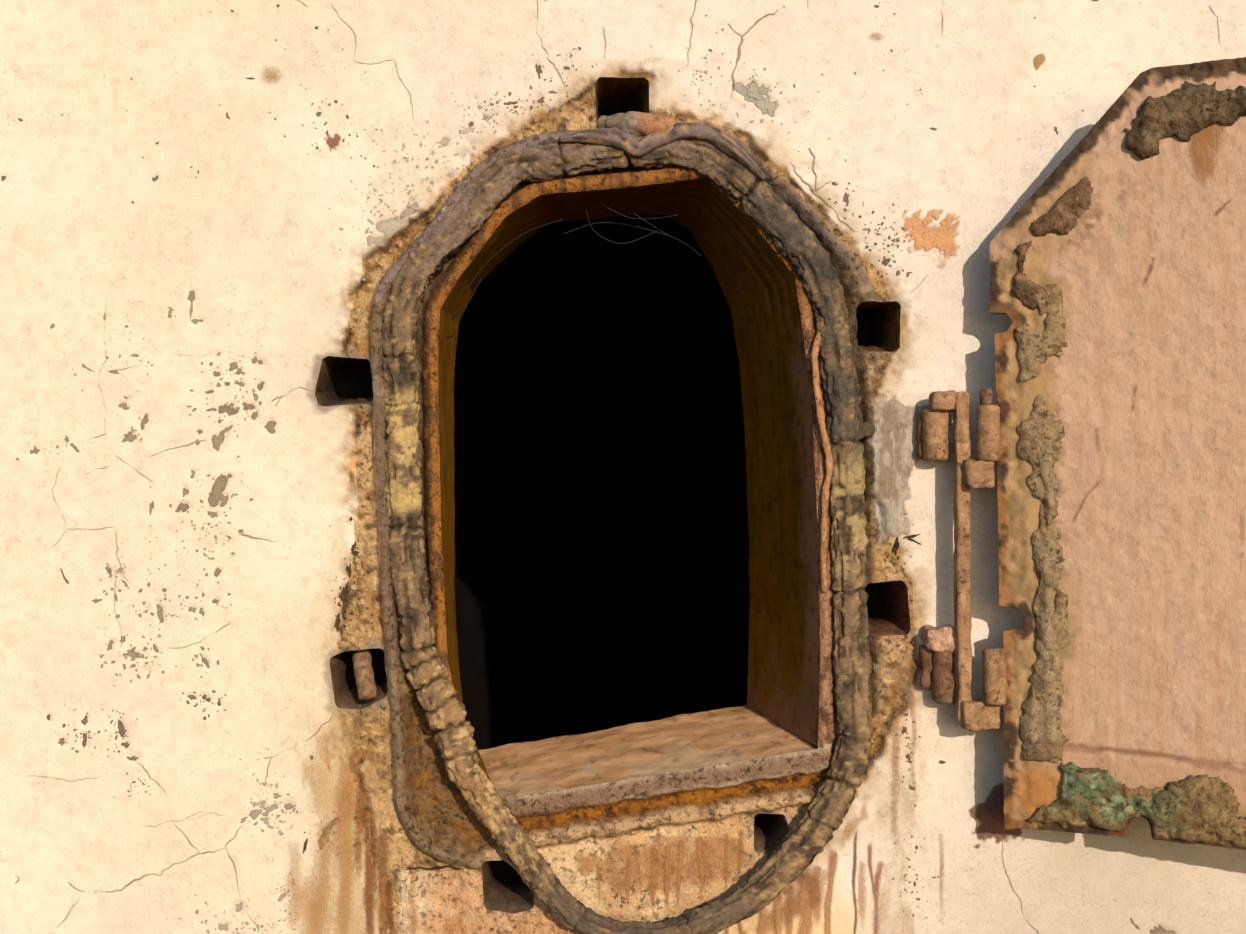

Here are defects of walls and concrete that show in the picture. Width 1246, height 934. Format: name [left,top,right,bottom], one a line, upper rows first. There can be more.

crack [298,0,414,123]
crack [687,0,779,96]
peeling [828,181,959,293]
peeling [187,346,277,452]
crack [52,299,203,640]
peeling [92,470,254,686]
peeling [47,709,151,798]
crack [57,762,262,932]
corrosion [291,720,394,934]
corrosion [726,852,837,934]
corrosion [847,815,882,934]
corrosion [970,782,1024,848]